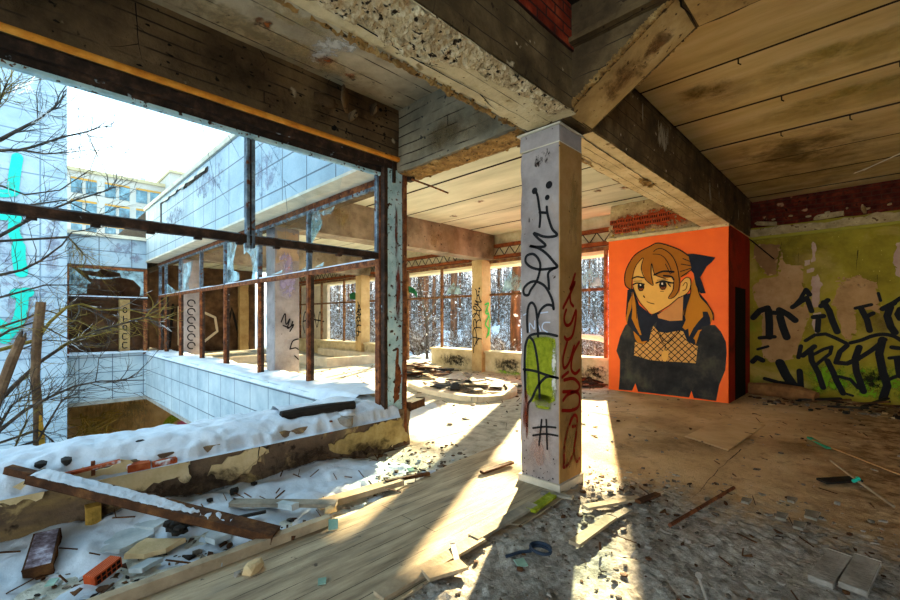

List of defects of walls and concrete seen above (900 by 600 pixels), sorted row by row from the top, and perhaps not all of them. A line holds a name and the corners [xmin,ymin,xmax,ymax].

spalling [306,0,675,180]
flaking render [608,205,679,238]
flaking render [806,207,848,220]
peeling [752,242,823,362]
peeling [831,275,880,340]
flaking render [74,456,191,491]
flaking render [207,446,269,481]
flaking render [0,481,45,507]